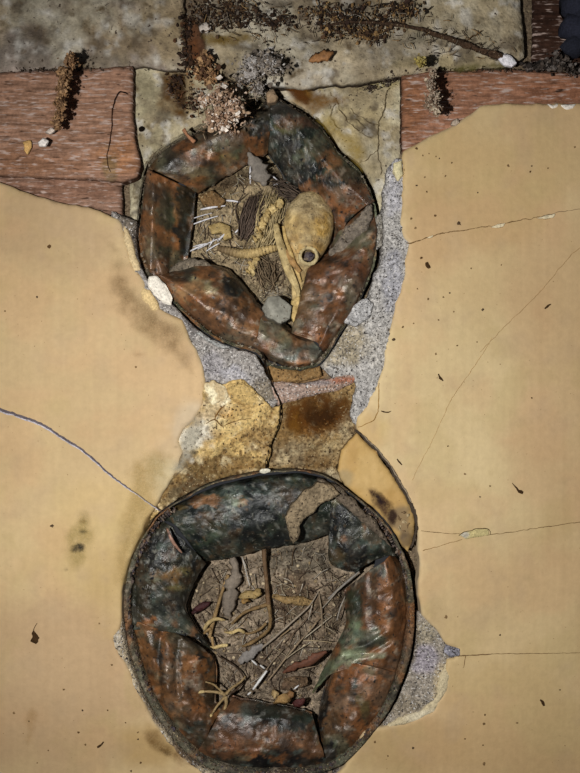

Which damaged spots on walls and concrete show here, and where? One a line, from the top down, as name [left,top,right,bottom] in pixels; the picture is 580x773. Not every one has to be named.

crack [407,209,577,244]
crack [355,248,580,551]
crack [0,408,160,511]